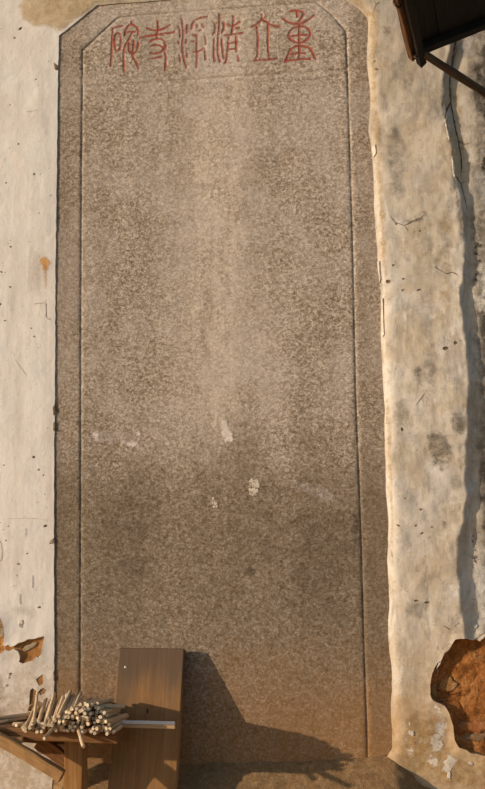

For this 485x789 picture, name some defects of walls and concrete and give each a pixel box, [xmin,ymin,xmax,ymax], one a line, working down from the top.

crack [445,42,468,208]
leakage [474,48,485,117]
leakage [473,242,485,358]
leakage [472,535,485,628]
flaking render [0,619,44,663]
flaking render [403,632,485,784]